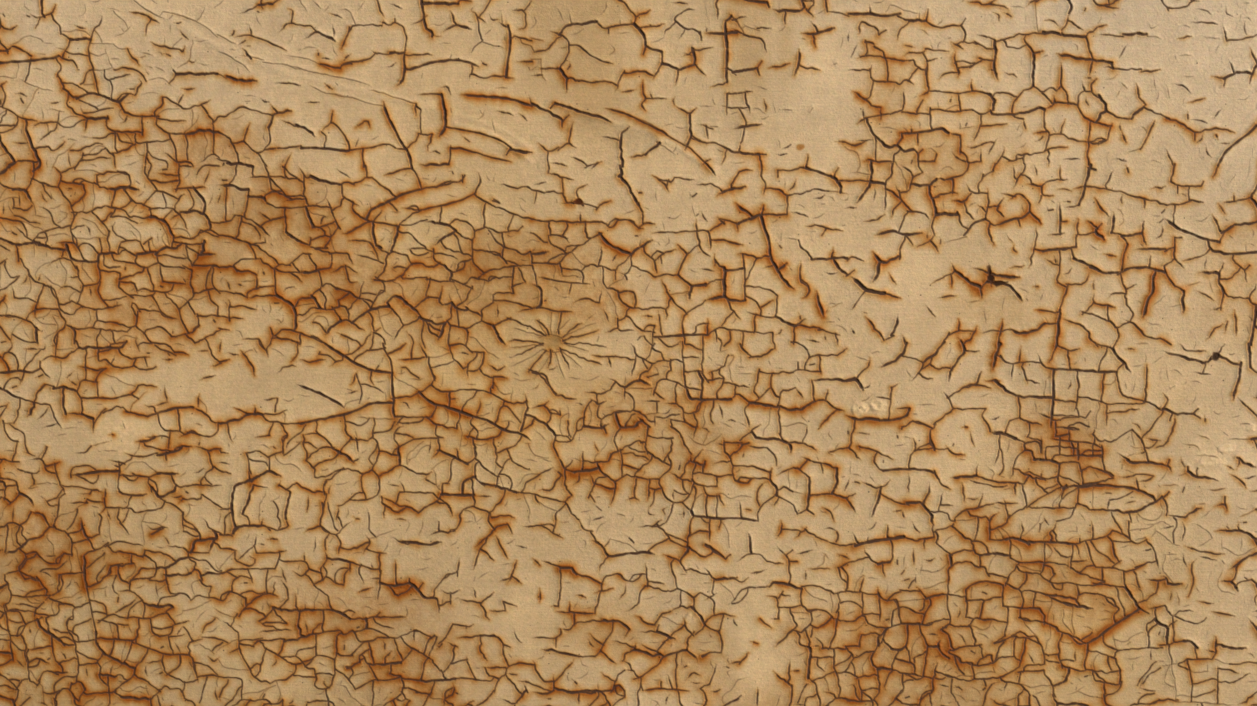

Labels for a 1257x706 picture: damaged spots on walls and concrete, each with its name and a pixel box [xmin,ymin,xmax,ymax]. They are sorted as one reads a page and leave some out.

crack [0,598,128,706]
crack [86,549,112,583]
crack [91,573,138,662]
crack [155,597,302,706]
crack [227,616,381,696]
crack [237,565,425,640]
crack [505,551,718,706]
rust [604,683,626,695]
crack [668,608,812,706]
crack [792,588,866,640]
crack [821,575,1018,706]
crack [1014,597,1115,706]